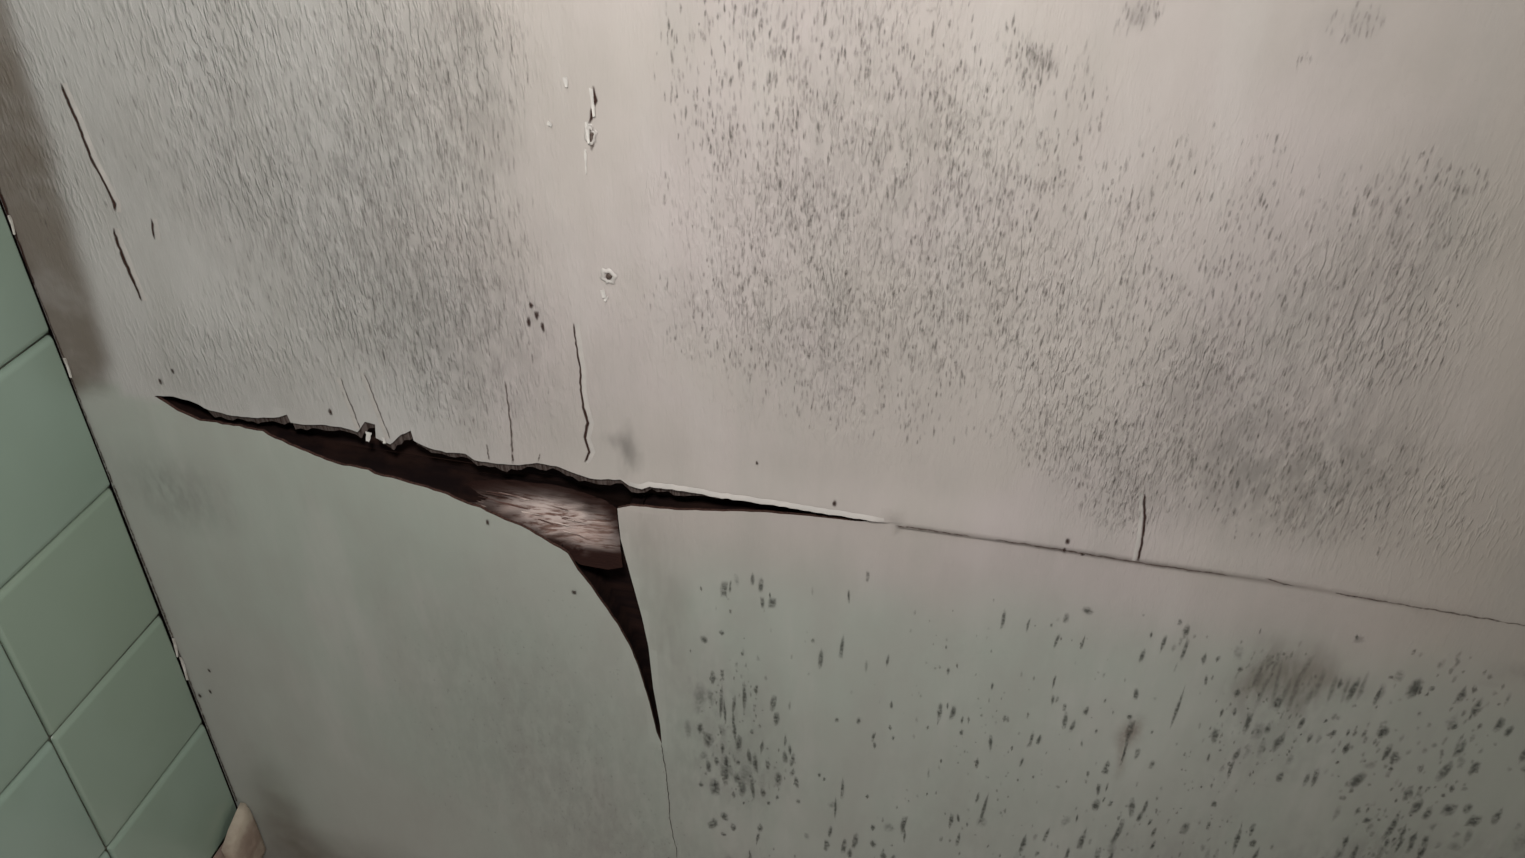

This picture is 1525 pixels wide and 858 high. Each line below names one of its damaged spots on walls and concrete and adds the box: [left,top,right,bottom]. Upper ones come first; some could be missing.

leakage [0,51,75,278]
crack [61,83,161,301]
leakage [44,308,98,382]
crack [0,192,237,801]
crack [160,323,963,856]
crack [1001,493,1224,575]
crack [1338,593,1525,626]
leakage [699,689,798,804]
leakage [1386,769,1476,858]